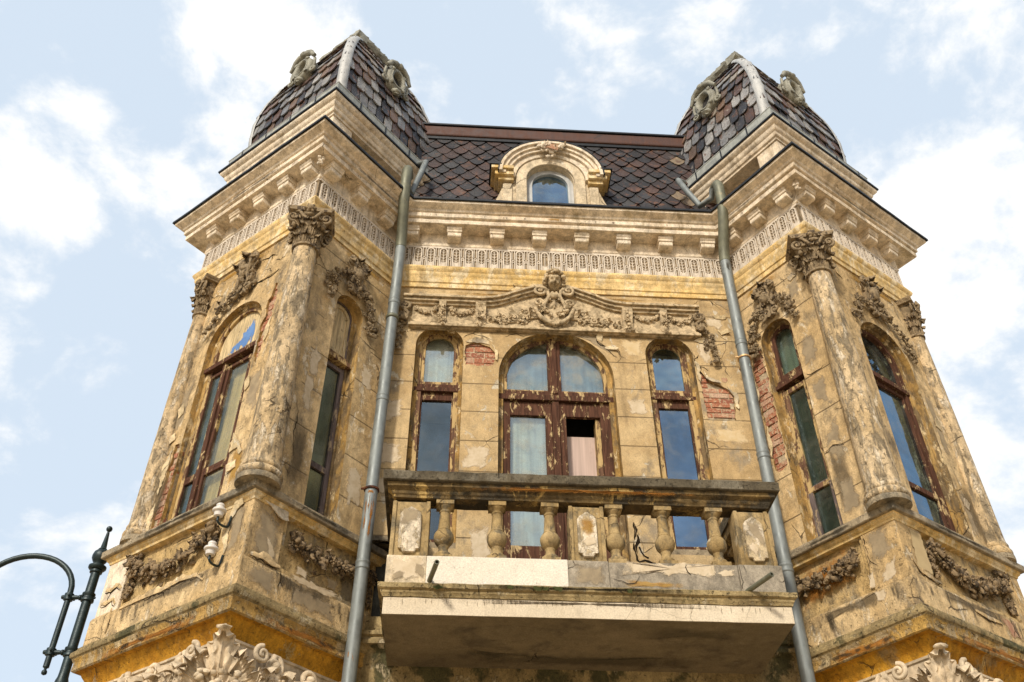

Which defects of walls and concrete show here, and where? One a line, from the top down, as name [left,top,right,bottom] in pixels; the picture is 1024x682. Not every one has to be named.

flaking render [465,333,498,366]
flaking render [694,338,748,443]
flaking render [752,351,787,472]
spalling [583,521,596,545]
crack [615,520,655,584]
peeling [623,561,734,587]